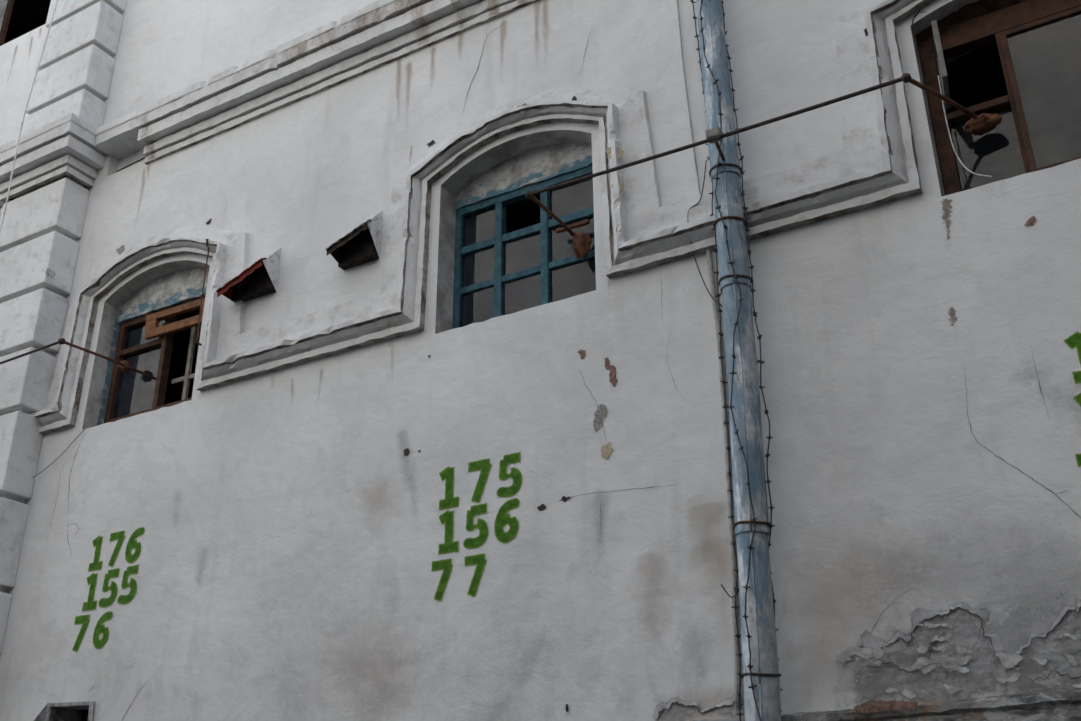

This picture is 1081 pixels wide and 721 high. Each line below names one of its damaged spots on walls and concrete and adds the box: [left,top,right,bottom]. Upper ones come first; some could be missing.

flaking render [605,357,618,388]
flaking render [593,404,607,431]
flaking render [601,442,613,458]
crack [963,362,1081,518]
flaking render [835,597,1081,714]
flaking render [652,693,745,721]